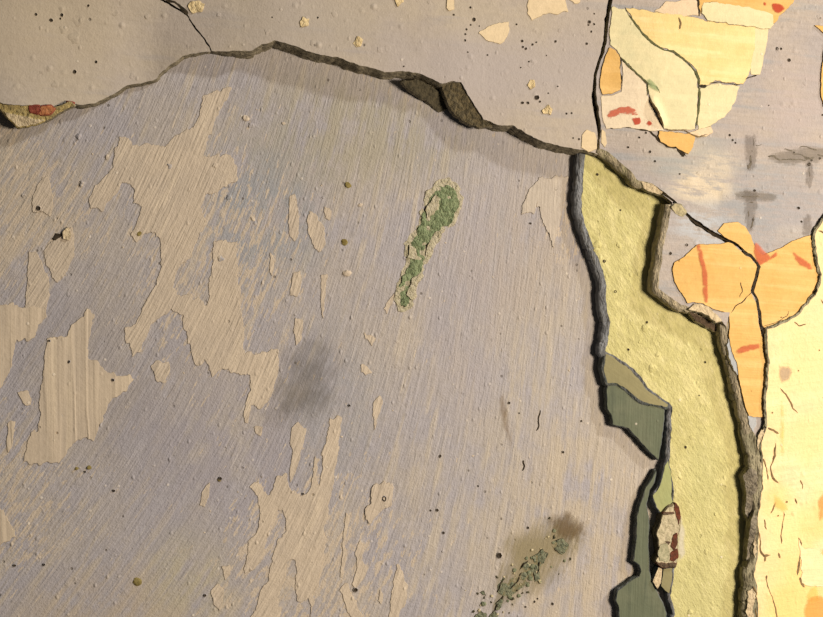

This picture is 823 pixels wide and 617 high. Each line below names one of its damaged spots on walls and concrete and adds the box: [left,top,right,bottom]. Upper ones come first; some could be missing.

peeling [0,0,211,129]
crack [161,0,209,46]
crack [592,0,757,157]
peeling [0,227,75,388]
peeling [32,177,53,216]
peeling [88,87,279,436]
peeling [173,0,823,617]
crack [674,202,806,334]
peeling [17,309,134,466]
crack [753,428,805,617]